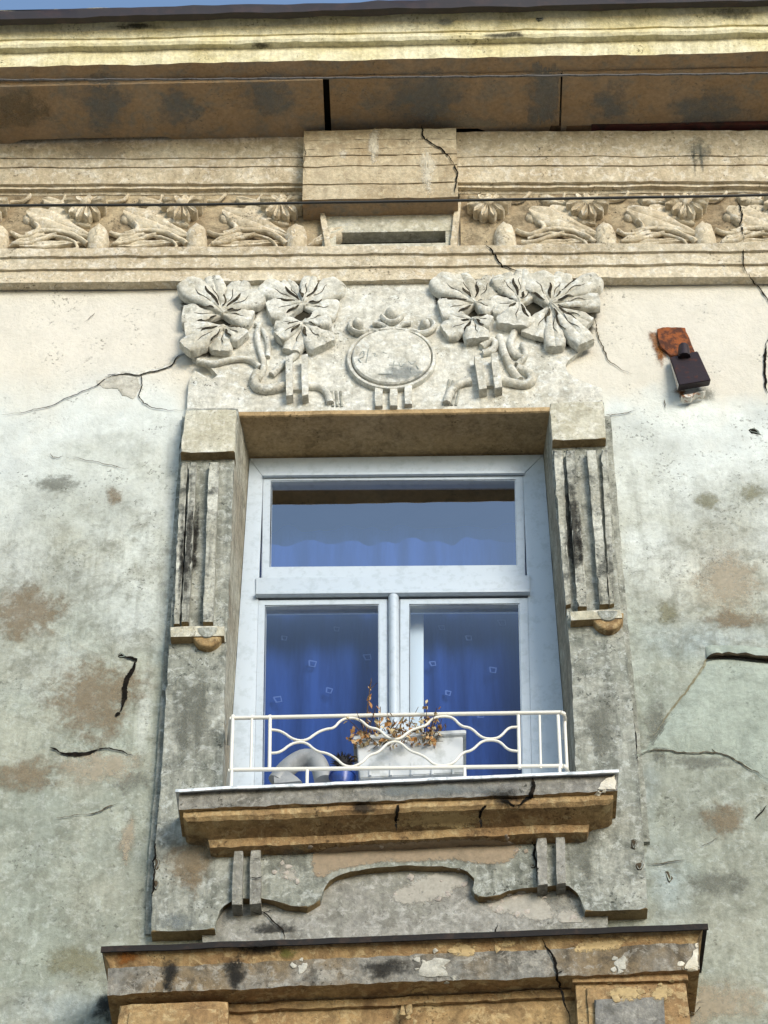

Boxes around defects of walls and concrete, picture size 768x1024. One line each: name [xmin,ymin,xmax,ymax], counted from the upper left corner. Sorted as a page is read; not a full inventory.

crack [737,202,768,301]
crack [2,353,185,415]
corrosion [650,333,665,360]
crack [760,340,768,393]
damp [179,507,199,591]
crack [115,656,137,716]
crack [50,747,131,756]
peeling [308,834,535,905]
peeling [485,891,584,929]
peeling [399,942,475,1024]
peeling [575,934,674,1003]
peeling [677,943,699,971]